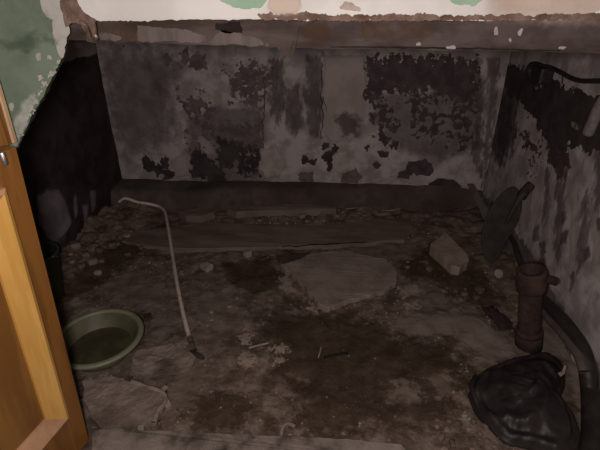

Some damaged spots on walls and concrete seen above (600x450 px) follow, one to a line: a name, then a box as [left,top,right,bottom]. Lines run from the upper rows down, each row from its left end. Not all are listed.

peeling [9,0,124,146]
peeling [141,155,175,180]
peeling [175,85,265,181]
peeling [219,58,278,112]
peeling [298,142,339,182]
peeling [362,42,484,169]
leakage [492,85,521,166]